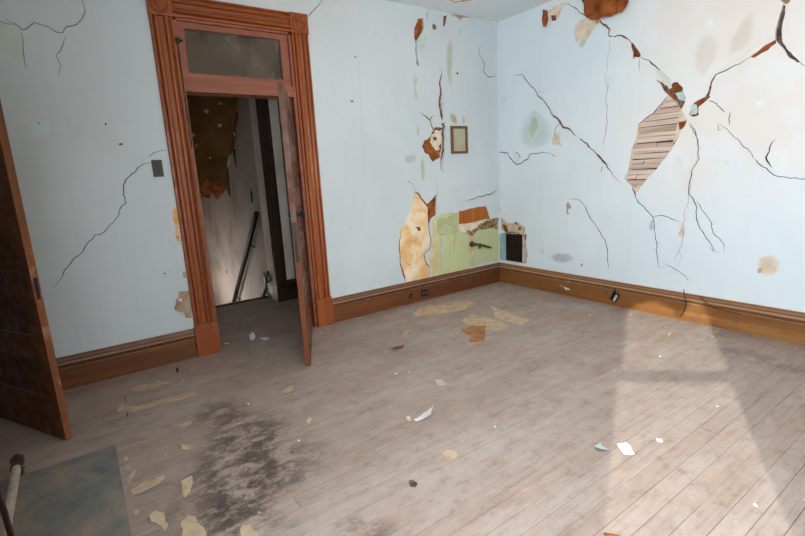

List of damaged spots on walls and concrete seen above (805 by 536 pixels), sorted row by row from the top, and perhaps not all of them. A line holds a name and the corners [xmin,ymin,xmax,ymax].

crack [55,150,162,286]
spalling [174,290,192,318]
spalling [422,130,442,161]
peeling [398,192,528,282]
crack [498,4,670,183]
crack [635,126,725,282]
spalling [657,69,710,130]
crack [696,0,805,189]